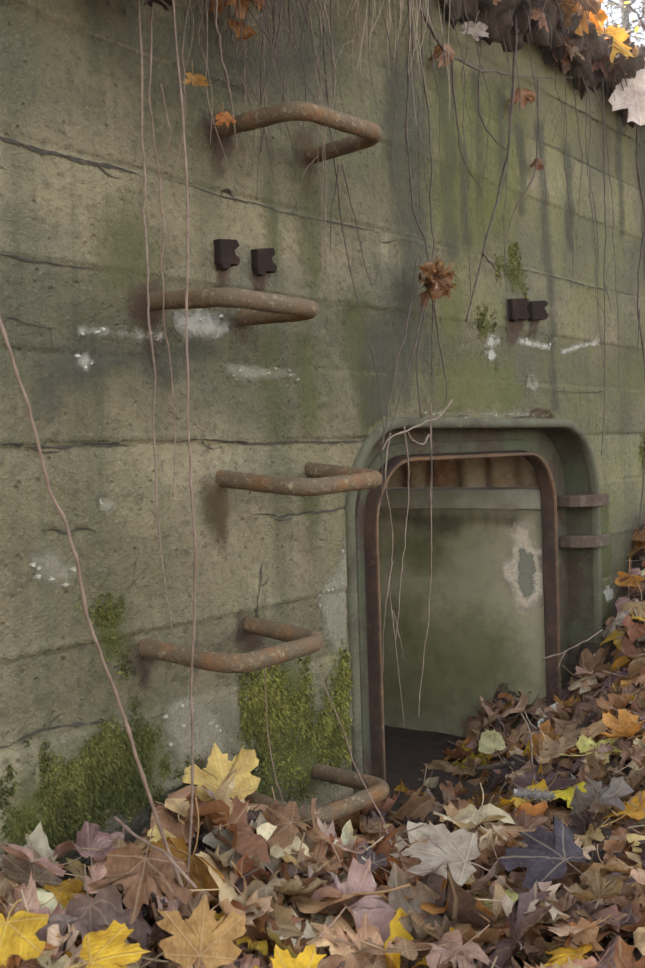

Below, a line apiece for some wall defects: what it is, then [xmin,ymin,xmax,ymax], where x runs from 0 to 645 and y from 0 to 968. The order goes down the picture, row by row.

crack [0,136,635,296]
peeling [498,525,543,614]